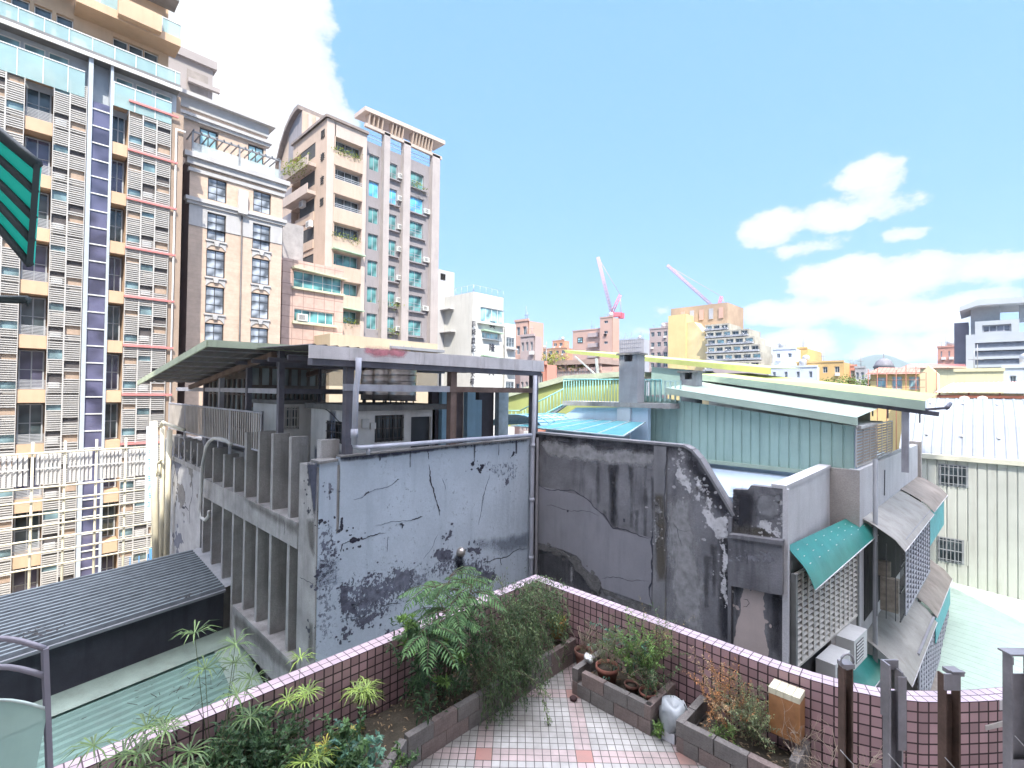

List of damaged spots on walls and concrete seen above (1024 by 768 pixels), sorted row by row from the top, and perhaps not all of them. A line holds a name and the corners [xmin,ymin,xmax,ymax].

peeling [304,471,417,645]
crack [340,451,446,558]
damp [312,435,774,643]
crack [540,448,685,600]
flaking render [668,447,783,657]